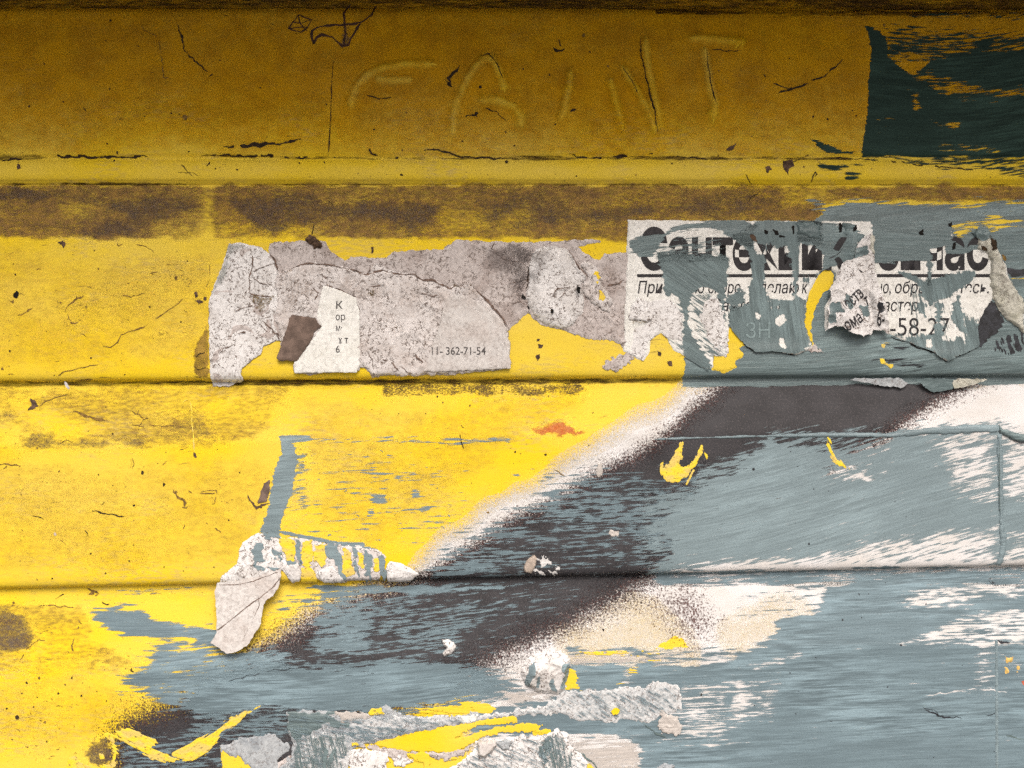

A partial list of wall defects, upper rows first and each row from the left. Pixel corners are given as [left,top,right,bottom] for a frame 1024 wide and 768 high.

peeling [804,269,834,346]
peeling [713,343,744,371]
peeling [351,636,688,768]